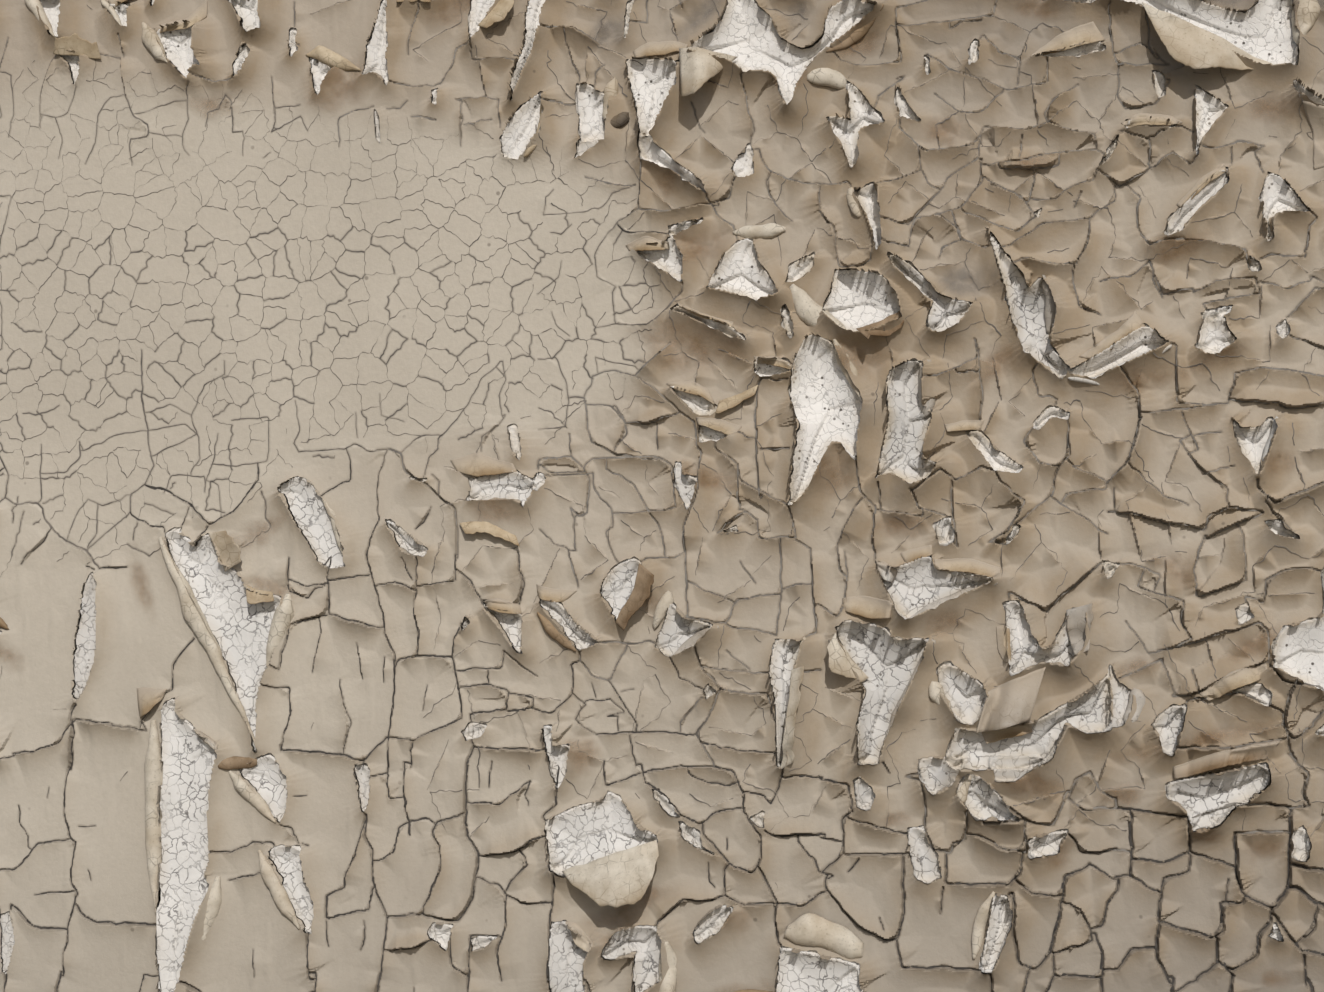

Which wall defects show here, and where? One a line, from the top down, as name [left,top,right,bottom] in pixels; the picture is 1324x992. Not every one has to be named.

crack [408,1,462,59]
crack [543,0,682,97]
peeling [575,0,884,193]
peeling [1124,0,1324,170]
peeling [666,183,972,509]
peeling [875,359,1023,484]
peeling [990,233,1172,385]
peeling [827,516,1280,831]
peeling [1199,567,1324,707]
peeling [137,527,294,992]
peeling [545,791,659,908]
peeling [547,920,677,992]